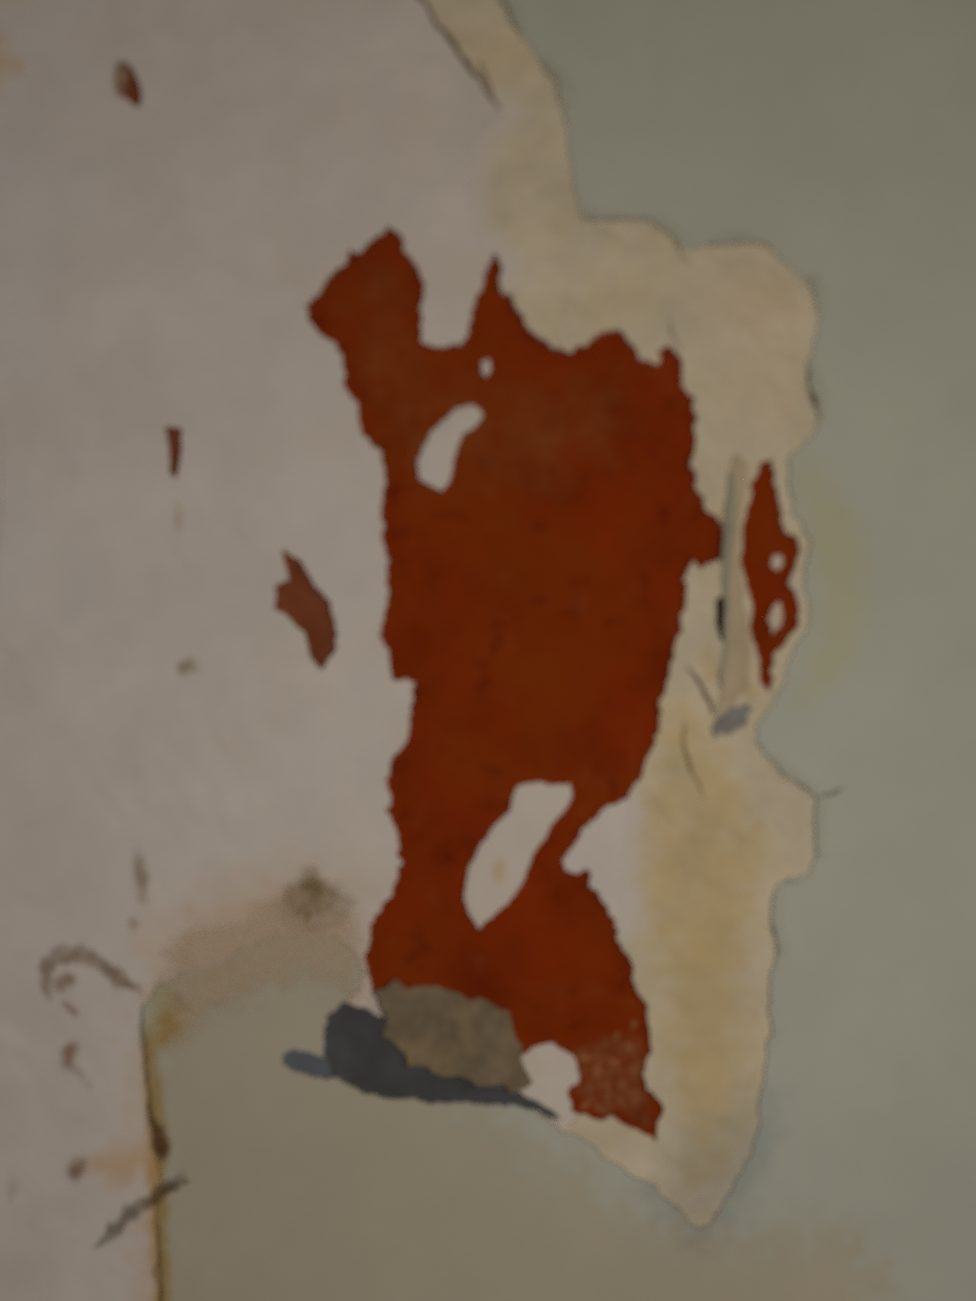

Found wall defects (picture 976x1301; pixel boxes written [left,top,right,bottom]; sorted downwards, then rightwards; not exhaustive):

flaking render [115,63,142,107]
flaking render [165,428,182,478]
flaking render [740,461,800,691]
flaking render [275,228,723,1140]
peeling [712,703,752,738]